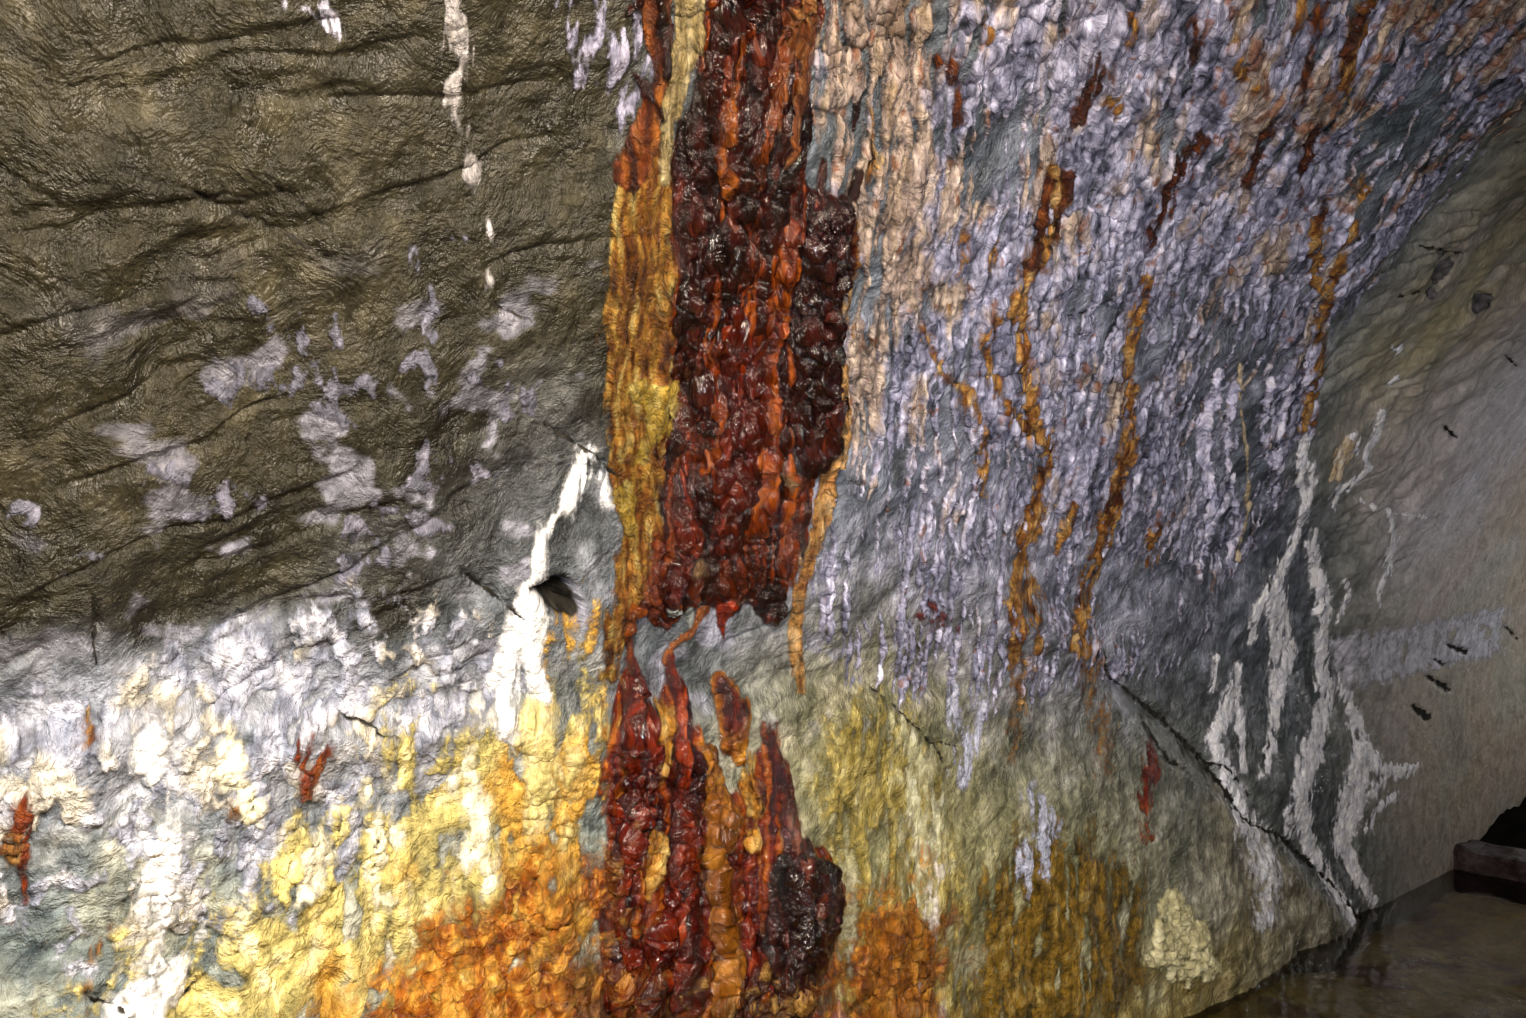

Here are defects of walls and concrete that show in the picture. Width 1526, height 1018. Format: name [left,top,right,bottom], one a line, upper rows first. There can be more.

corrosion [1064,51,1125,142]
corrosion [1146,128,1212,254]
leakage [203,326,393,429]
leakage [329,313,343,349]
leakage [399,247,439,391]
corrosion [1294,121,1373,434]
corrosion [914,161,1155,773]
leakage [796,0,1526,1018]
leakage [0,440,616,1018]
corrosion [294,735,332,802]
crack [1094,624,1361,920]
corrosion [0,791,35,905]